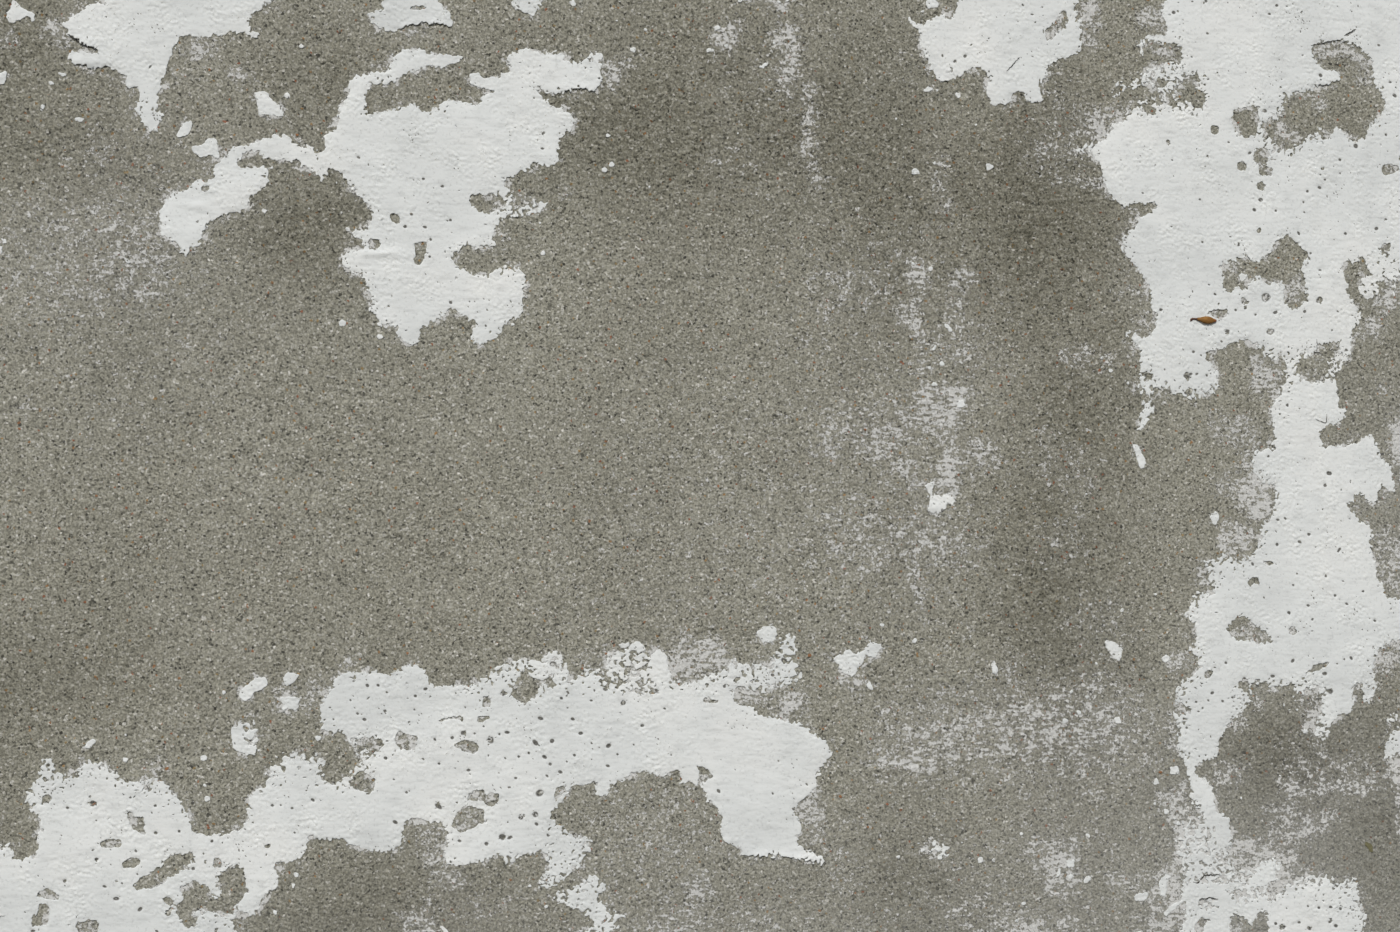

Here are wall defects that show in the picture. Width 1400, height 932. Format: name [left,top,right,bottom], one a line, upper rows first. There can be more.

peeling [0,0,645,369]
peeling [593,352,699,495]
peeling [899,0,1400,932]
peeling [0,474,1009,932]